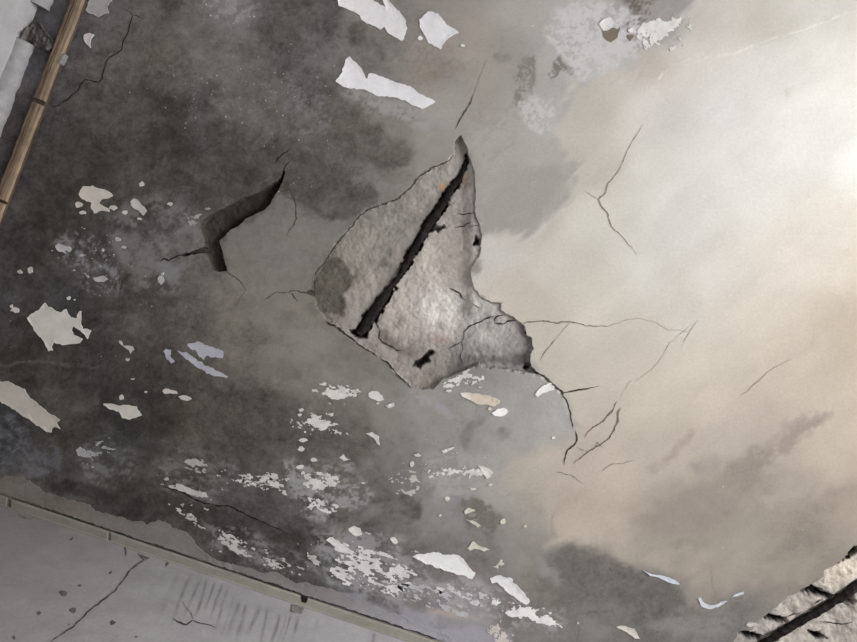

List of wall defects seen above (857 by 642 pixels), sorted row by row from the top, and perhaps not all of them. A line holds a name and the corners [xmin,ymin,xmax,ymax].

crack [53,8,141,107]
peeling [336,56,436,109]
water stain [47,0,446,319]
crack [587,125,643,253]
peeling [10,296,91,351]
water stain [375,328,418,361]
spalling [303,134,540,417]
water stain [414,289,485,328]
crack [450,288,696,482]
crack [12,498,436,641]
peeling [0,472,563,642]
spalling [734,545,857,642]